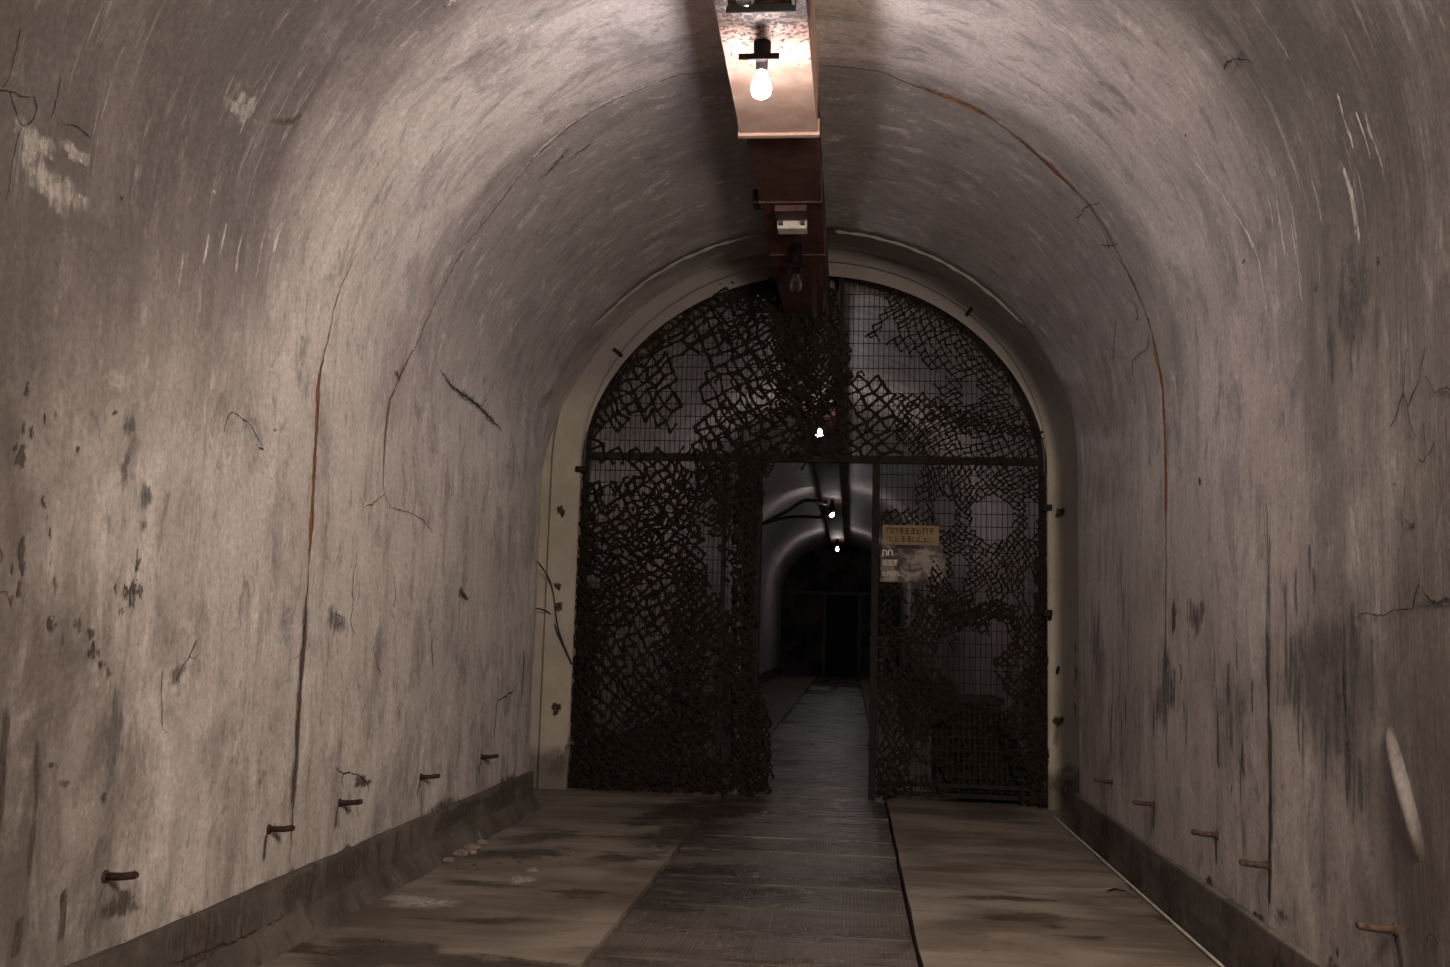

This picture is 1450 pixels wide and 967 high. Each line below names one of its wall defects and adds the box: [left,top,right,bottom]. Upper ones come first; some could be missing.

crack [0,29,91,193]
crack [364,69,719,533]
corrosion [838,66,1176,533]
crack [1390,348,1450,462]
water stain [1277,546,1374,817]
crack [1357,581,1450,617]